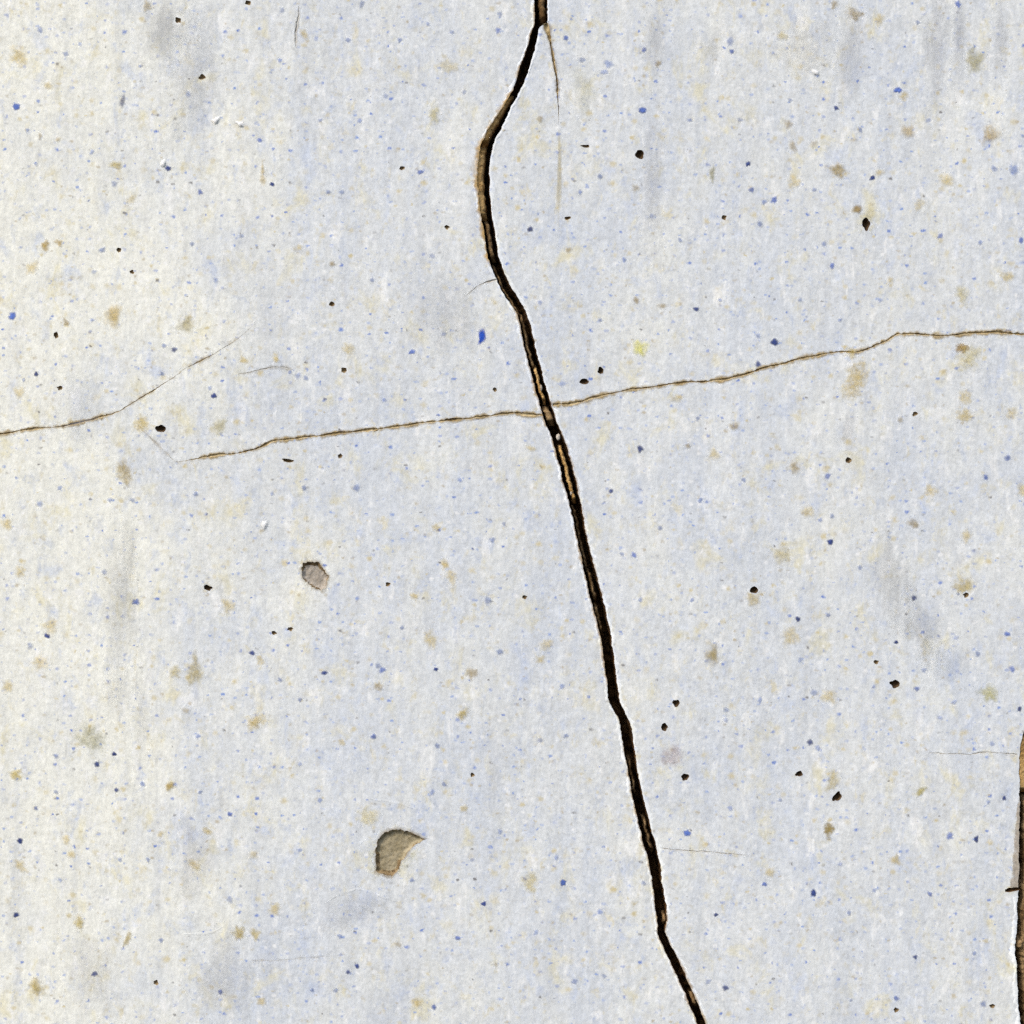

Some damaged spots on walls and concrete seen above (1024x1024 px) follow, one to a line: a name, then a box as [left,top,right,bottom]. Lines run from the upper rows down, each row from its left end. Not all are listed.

crack [0,323,256,435]
crack [553,329,1024,407]
crack [186,0,741,1024]
hole [301,562,329,590]
spalling [375,829,425,876]
crack [937,733,1024,1024]